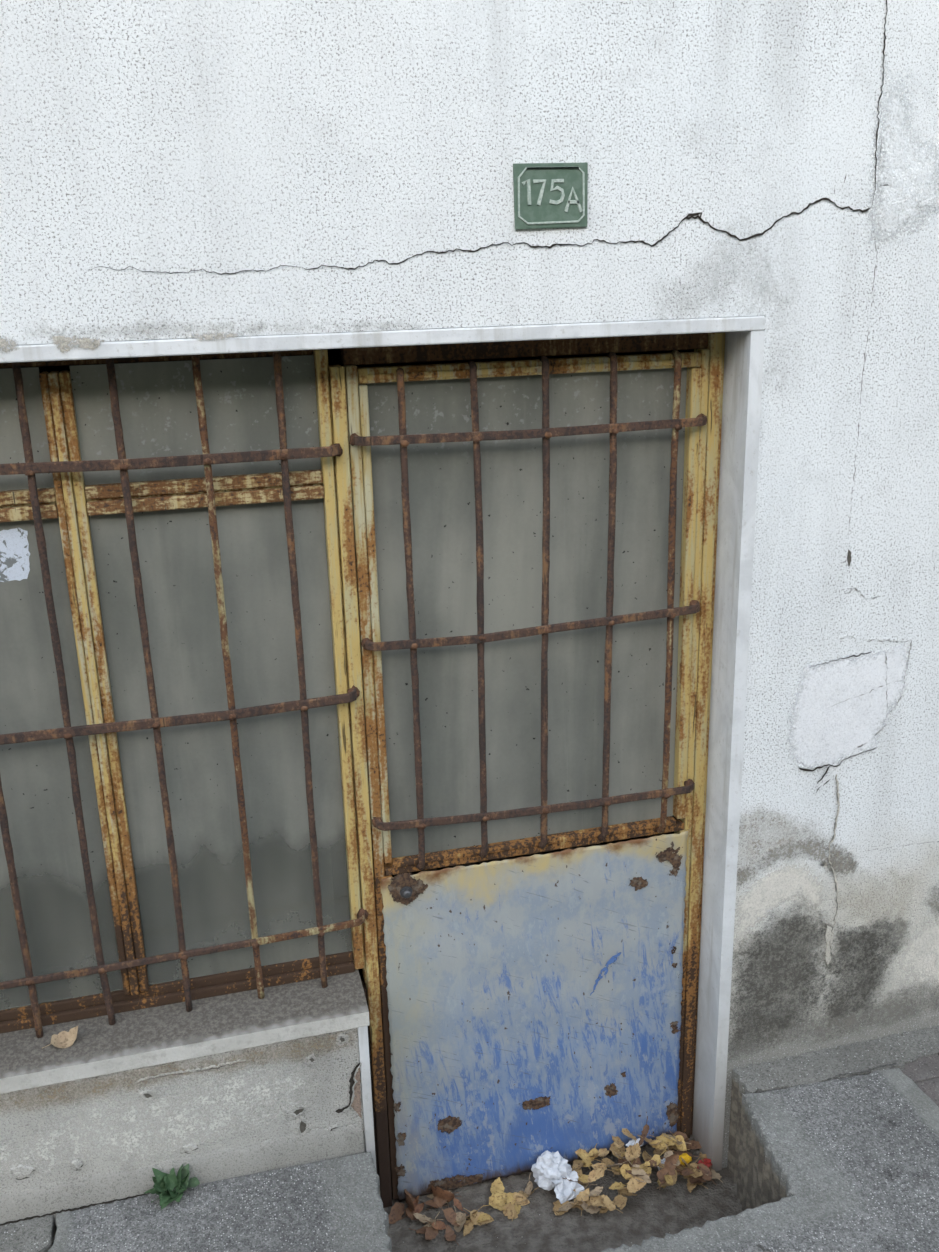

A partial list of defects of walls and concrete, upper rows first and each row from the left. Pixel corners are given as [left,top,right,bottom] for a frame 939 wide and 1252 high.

crack [95,0,890,534]
flaking render [788,633,914,772]
rust [655,847,683,876]
crack [816,766,840,967]
rust [388,872,428,906]
rust [629,876,648,891]
damp [729,817,939,1046]
rust [604,1071,626,1098]
rust [437,1116,462,1134]
rust [522,1096,551,1110]
rust [666,1102,679,1127]